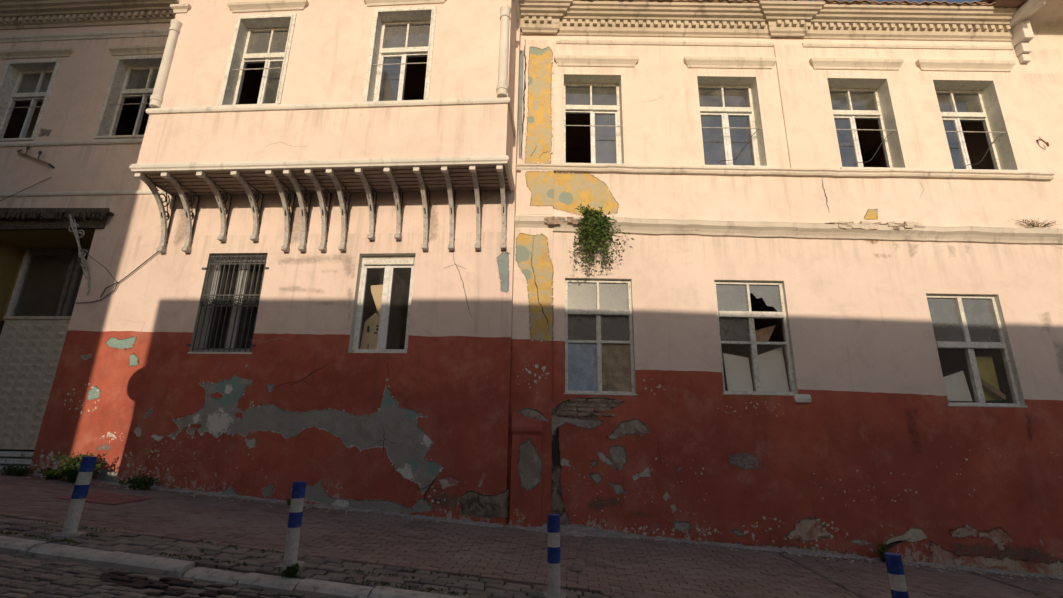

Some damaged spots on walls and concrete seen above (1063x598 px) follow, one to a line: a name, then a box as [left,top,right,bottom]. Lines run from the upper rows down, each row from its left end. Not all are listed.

peeling [496,46,620,342]
peeling [105,336,139,367]
peeling [97,365,848,549]
spalling [883,527,1063,576]